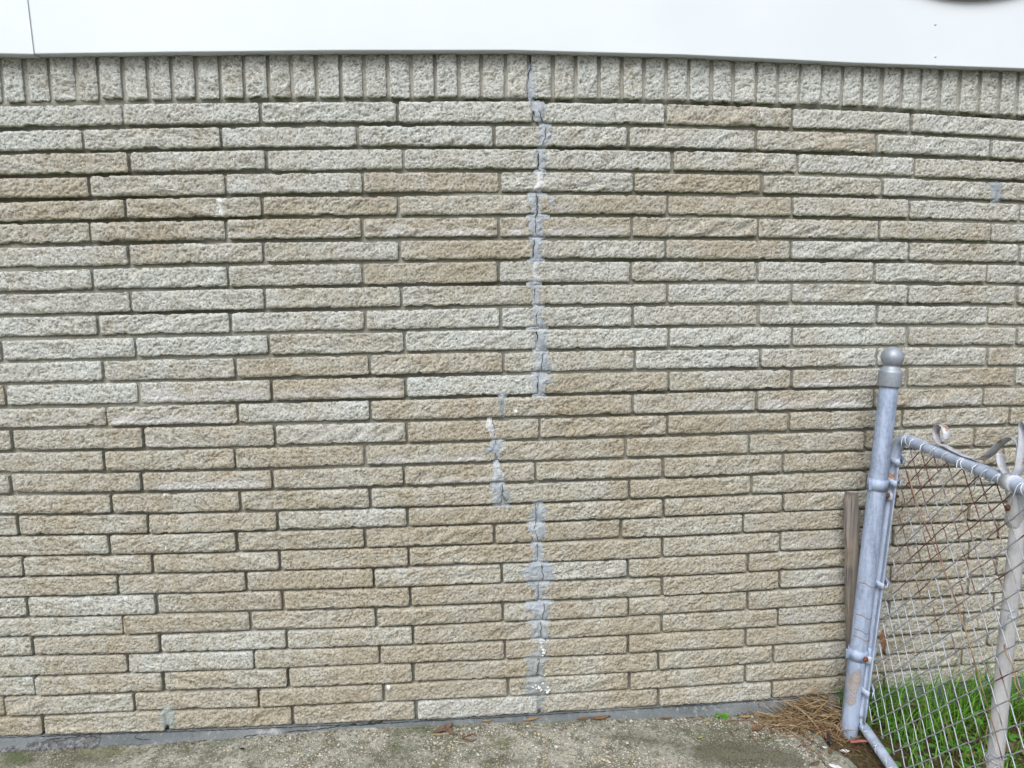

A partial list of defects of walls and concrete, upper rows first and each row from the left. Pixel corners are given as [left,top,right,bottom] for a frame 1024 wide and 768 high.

crack [485,58,556,712]